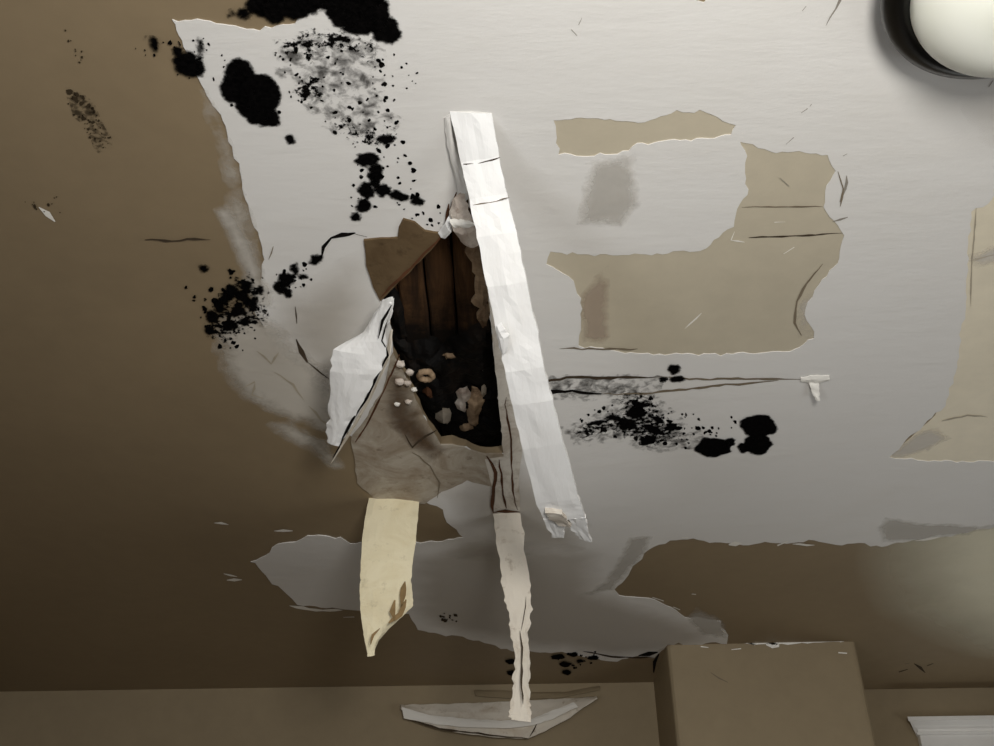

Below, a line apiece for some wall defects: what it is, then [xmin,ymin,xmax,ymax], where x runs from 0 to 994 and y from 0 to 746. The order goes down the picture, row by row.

damp [135,0,441,227]
peeling [554,110,735,156]
damp [184,254,323,351]
peeling [351,353,504,504]
damp [659,364,685,383]
damp [567,393,777,457]
peeling [547,142,844,356]
peeling [890,197,994,462]